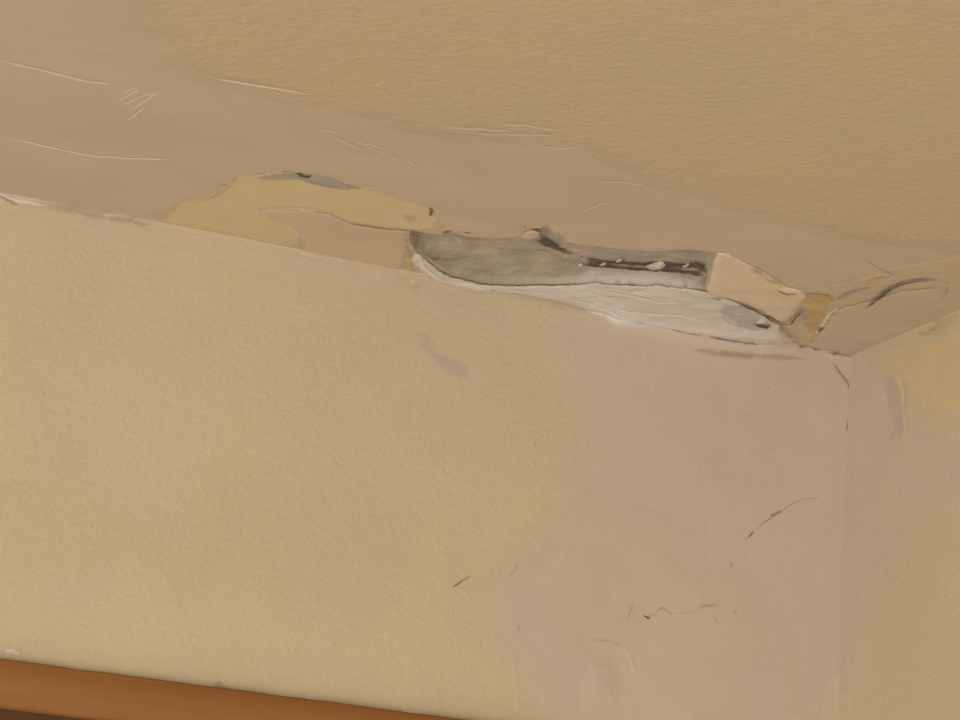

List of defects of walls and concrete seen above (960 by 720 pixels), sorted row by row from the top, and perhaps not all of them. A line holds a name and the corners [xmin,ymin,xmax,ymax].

spalling [163,171,716,290]
spalling [721,306,771,331]
crack [749,494,828,537]